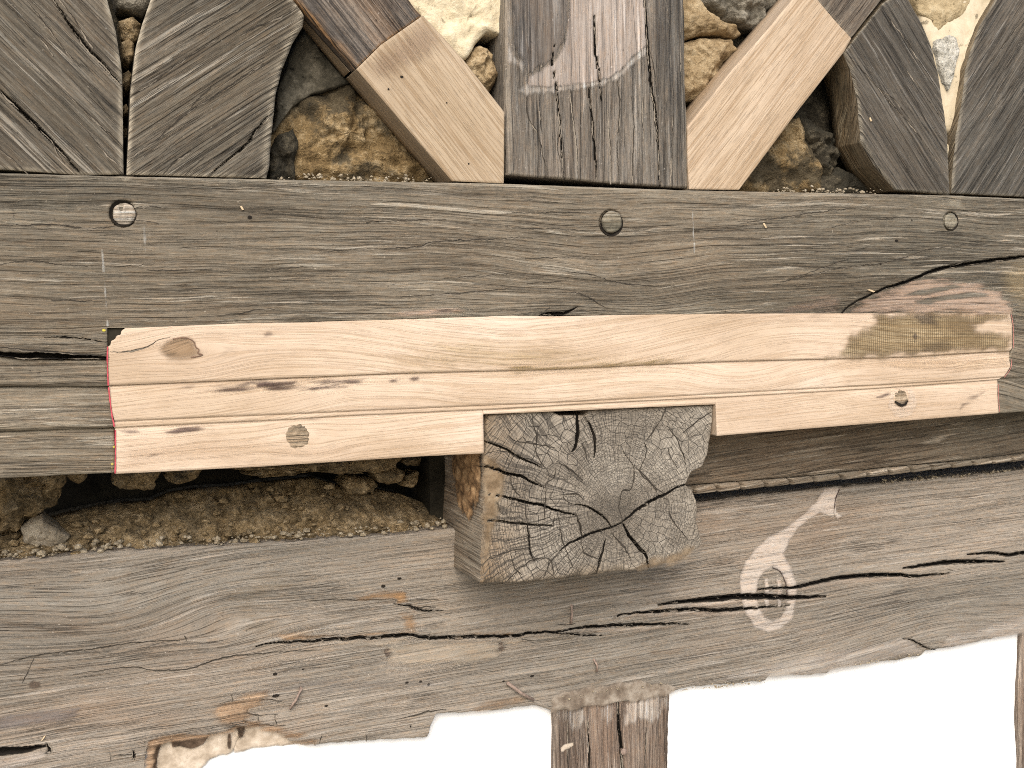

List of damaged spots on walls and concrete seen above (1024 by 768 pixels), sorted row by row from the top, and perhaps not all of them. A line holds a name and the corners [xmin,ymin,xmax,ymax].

crack [782,244,1024,313]
crack [0,336,170,360]
damp [842,313,1010,358]
crack [476,408,713,584]
crack [0,551,1024,683]